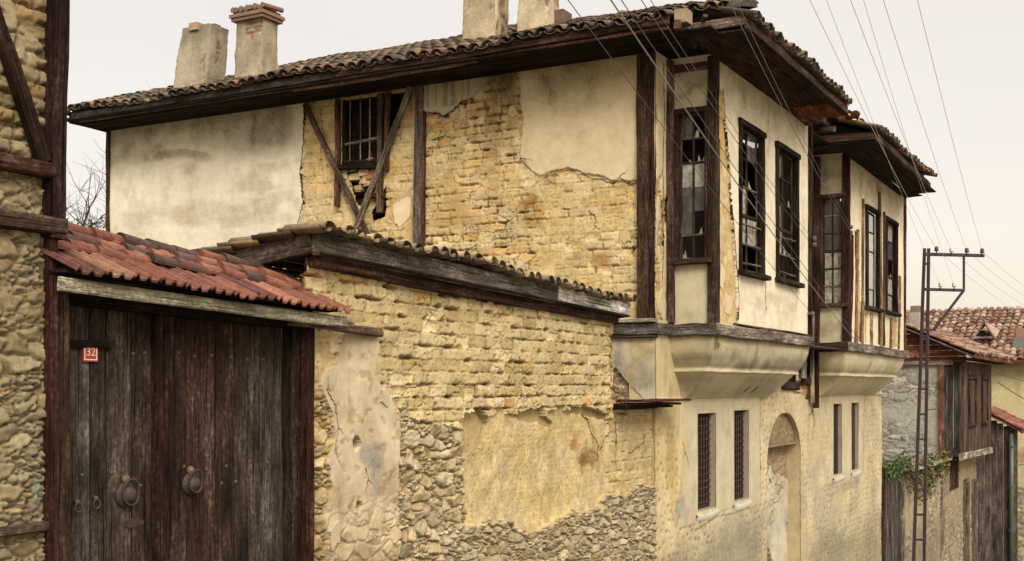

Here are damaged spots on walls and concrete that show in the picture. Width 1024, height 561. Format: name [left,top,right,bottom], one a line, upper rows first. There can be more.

crack [297,109,325,224]
spalling [348,157,412,231]
peeling [426,72,637,319]
crack [519,158,637,184]
crack [581,414,649,467]
peeling [767,466,788,561]